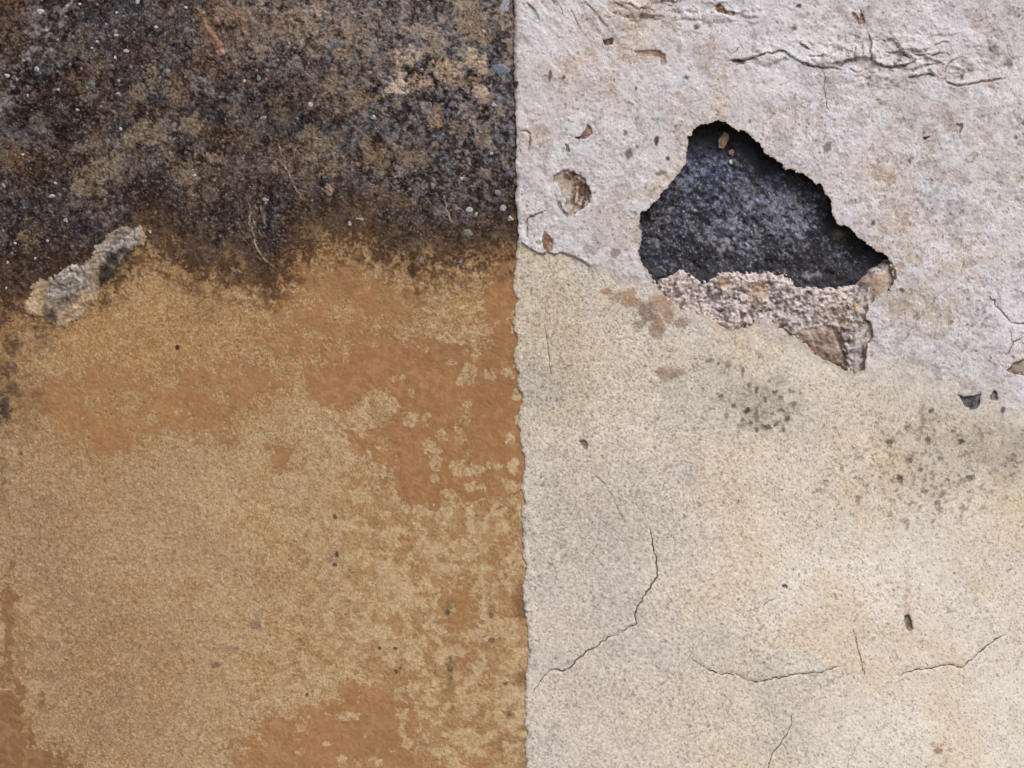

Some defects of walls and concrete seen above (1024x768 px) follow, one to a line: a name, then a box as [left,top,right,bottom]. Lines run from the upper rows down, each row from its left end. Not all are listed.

crack [731,15,1003,110]
water stain [0,0,519,424]
spalling [638,120,897,375]
crack [534,526,658,690]
crack [691,637,865,683]
crack [901,635,1003,676]